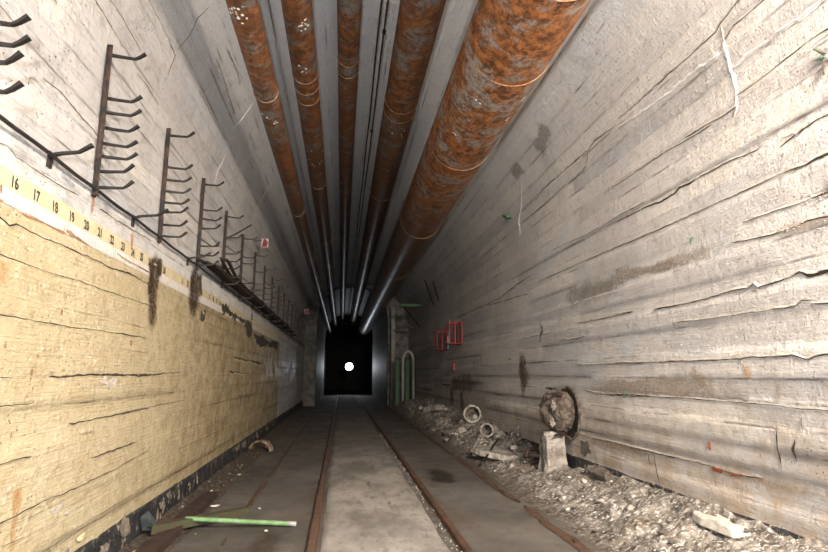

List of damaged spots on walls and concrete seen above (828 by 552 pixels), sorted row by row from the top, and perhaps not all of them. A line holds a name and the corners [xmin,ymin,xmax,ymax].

crack [552,111,828,250]
crack [456,150,828,323]
damp [148,257,162,325]
damp [190,270,202,313]
crack [559,309,634,340]
crack [48,372,180,381]
crack [576,352,828,365]
crack [0,403,34,411]
peeling [159,476,198,515]
peeling [119,515,131,538]